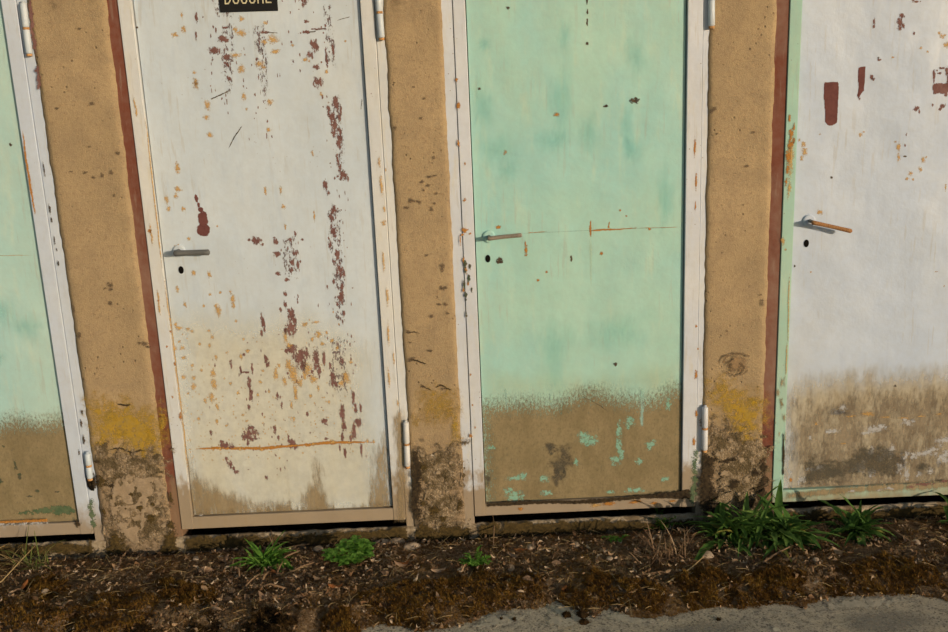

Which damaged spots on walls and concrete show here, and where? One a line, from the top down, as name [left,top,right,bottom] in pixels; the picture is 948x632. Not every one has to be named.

corrosion [146,125,186,263]
corrosion [157,286,375,467]
water stain [410,451,447,522]
peeling [503,472,527,501]
water stain [546,443,573,485]
peeling [577,431,598,446]
water stain [487,453,740,515]
peeling [610,416,636,466]
water stain [749,458,769,510]
water stain [805,447,897,482]